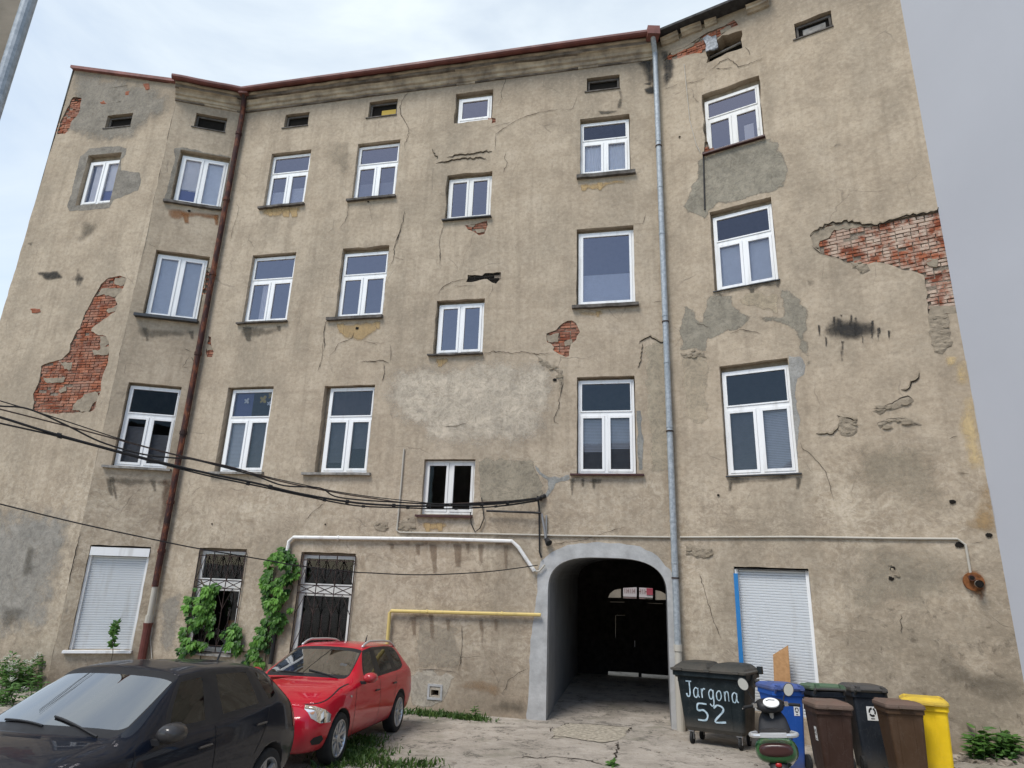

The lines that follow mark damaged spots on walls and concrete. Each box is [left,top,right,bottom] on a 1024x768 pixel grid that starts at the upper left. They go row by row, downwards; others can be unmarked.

spalling [666,20,738,60]
spalling [56,98,81,134]
crack [432,79,576,169]
spalling [465,221,488,235]
spalling [467,273,501,283]
spalling [811,210,957,354]
spalling [34,276,127,414]
spalling [536,321,580,393]
flaking render [837,415,858,436]
flaking render [874,396,921,429]